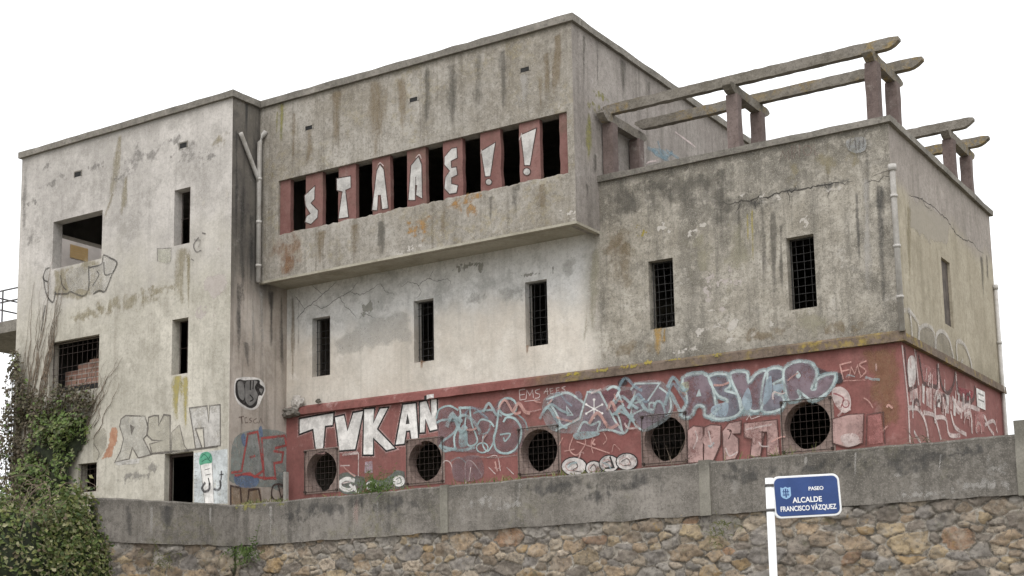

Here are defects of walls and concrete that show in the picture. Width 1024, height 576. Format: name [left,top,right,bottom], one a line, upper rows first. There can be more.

crack [718,170,890,212]
leakage [763,215,783,278]
crack [910,195,981,252]
crack [294,272,452,319]